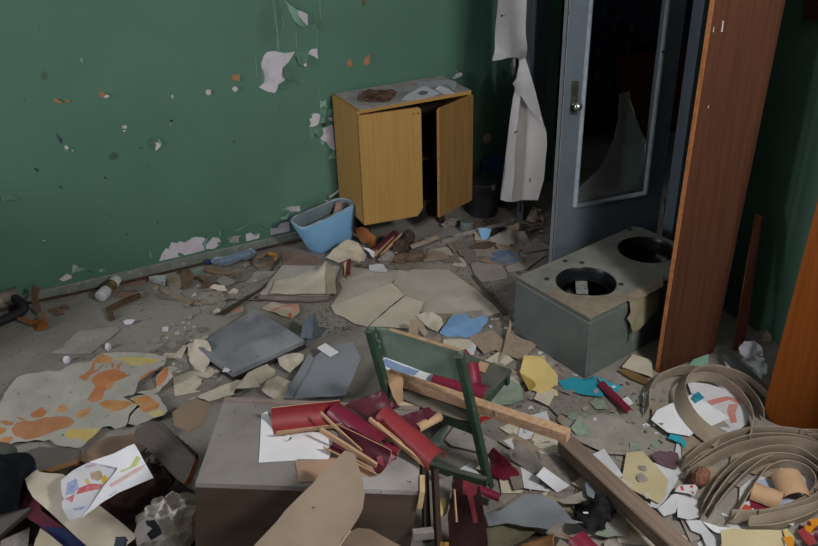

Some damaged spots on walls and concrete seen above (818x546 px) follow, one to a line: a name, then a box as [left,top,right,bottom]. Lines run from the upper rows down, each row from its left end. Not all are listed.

peeling [255,0,318,93]
peeling [309,99,336,159]
peeling [149,230,260,261]
peeling [270,205,311,235]